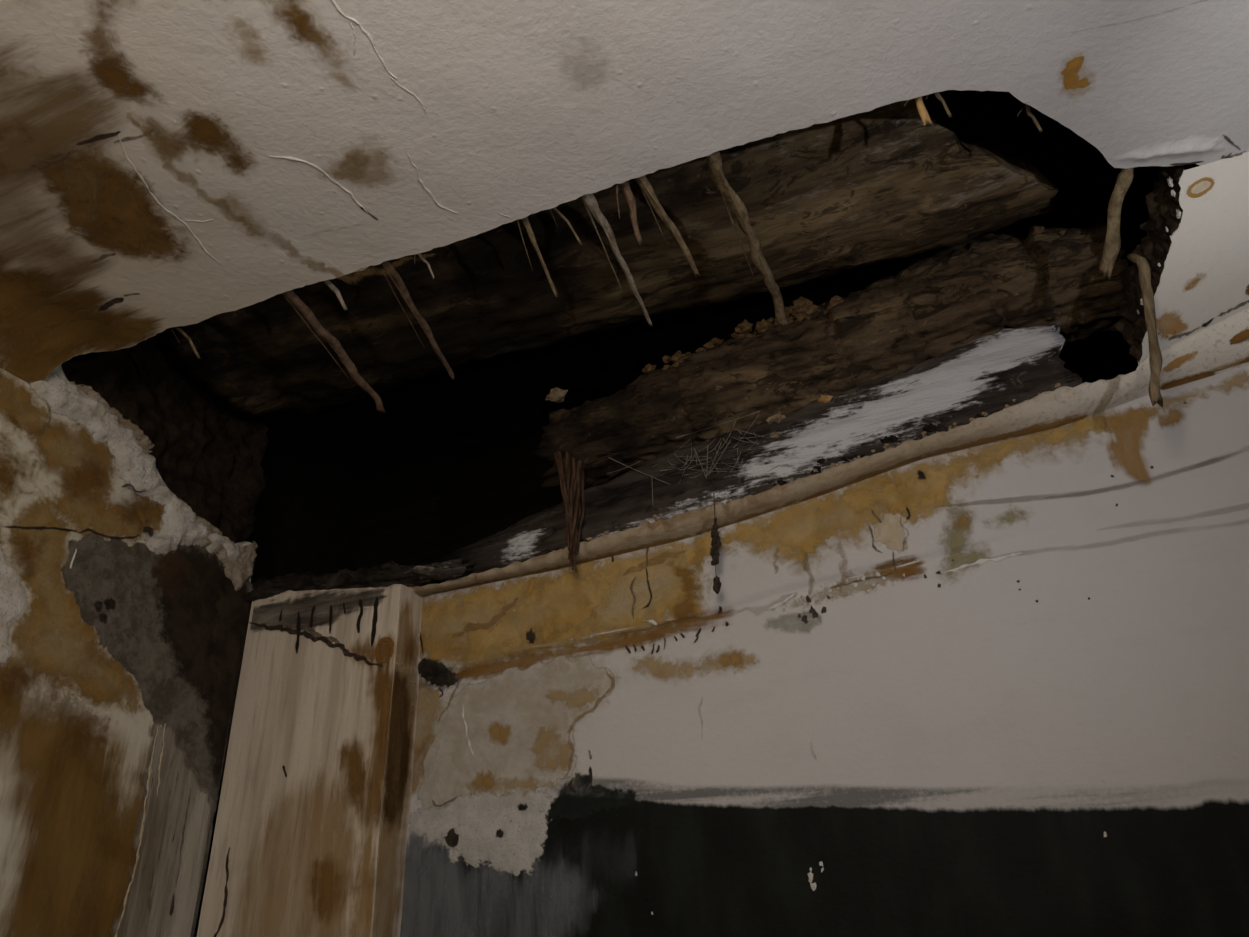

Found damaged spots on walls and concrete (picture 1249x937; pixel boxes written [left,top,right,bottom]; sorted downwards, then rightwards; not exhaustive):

water stain [283,5,325,46]
crack [331,0,426,112]
crack [15,130,219,262]
crack [269,155,378,220]
spalling [1115,165,1185,362]
crack [3,526,139,540]
water stain [0,0,185,937]
peeling [0,547,29,663]
spalling [24,370,258,937]
water stain [250,589,386,654]
water stain [373,352,1249,937]
peeling [409,633,615,877]